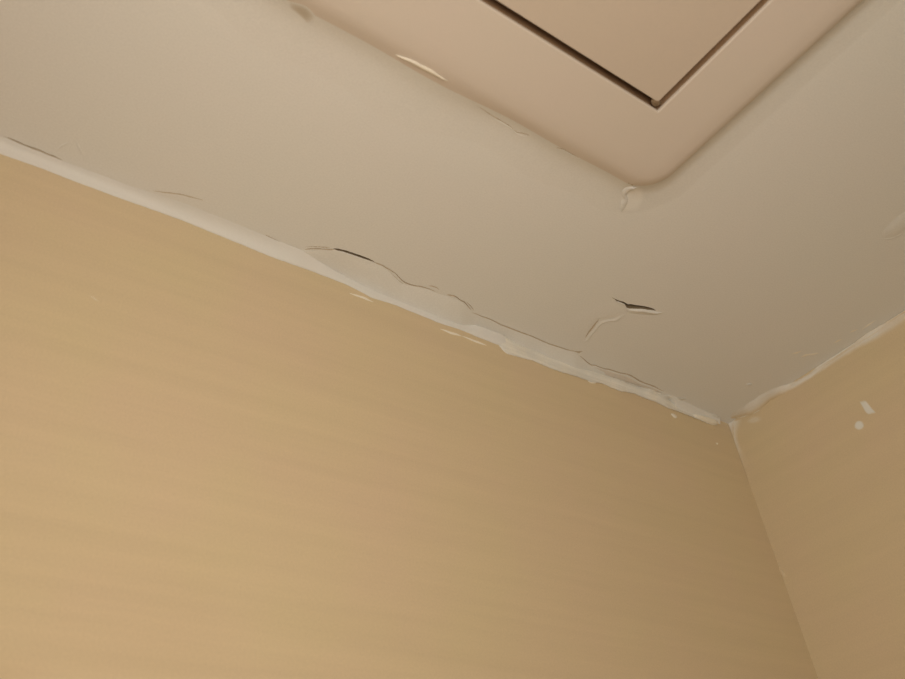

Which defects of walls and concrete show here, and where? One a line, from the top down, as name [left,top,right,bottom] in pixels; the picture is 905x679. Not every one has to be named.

peeling [396,55,447,81]
crack [305,246,664,391]